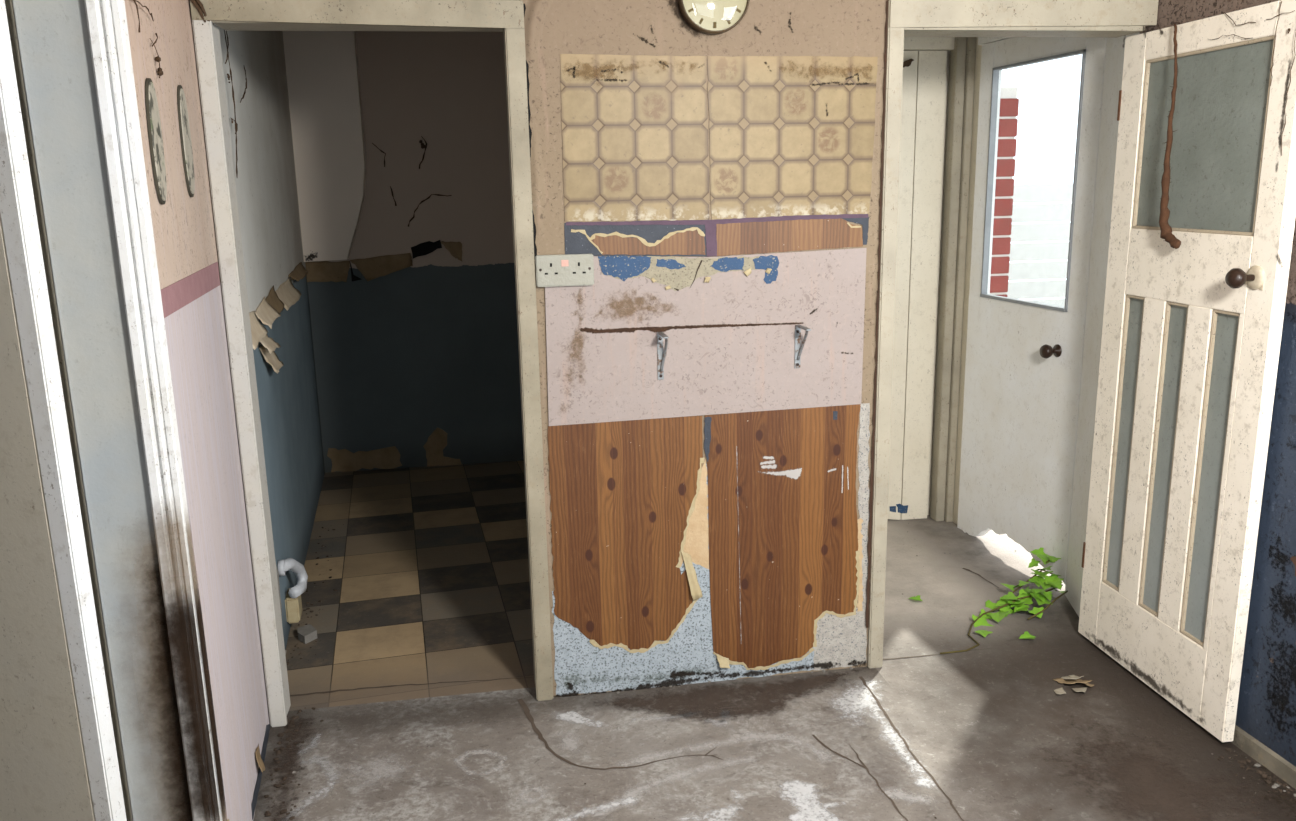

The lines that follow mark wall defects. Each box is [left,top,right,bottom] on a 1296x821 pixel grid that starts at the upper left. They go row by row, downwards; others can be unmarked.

peeling [598,255,779,291]
flaking render [552,403,870,695]
mould [1261,534,1296,740]
damp [455,750,506,775]
crack [290,677,723,770]
damp [558,757,752,821]
damp [553,660,936,801]
damp [780,781,844,821]
crack [812,735,908,821]
crack [859,654,964,821]